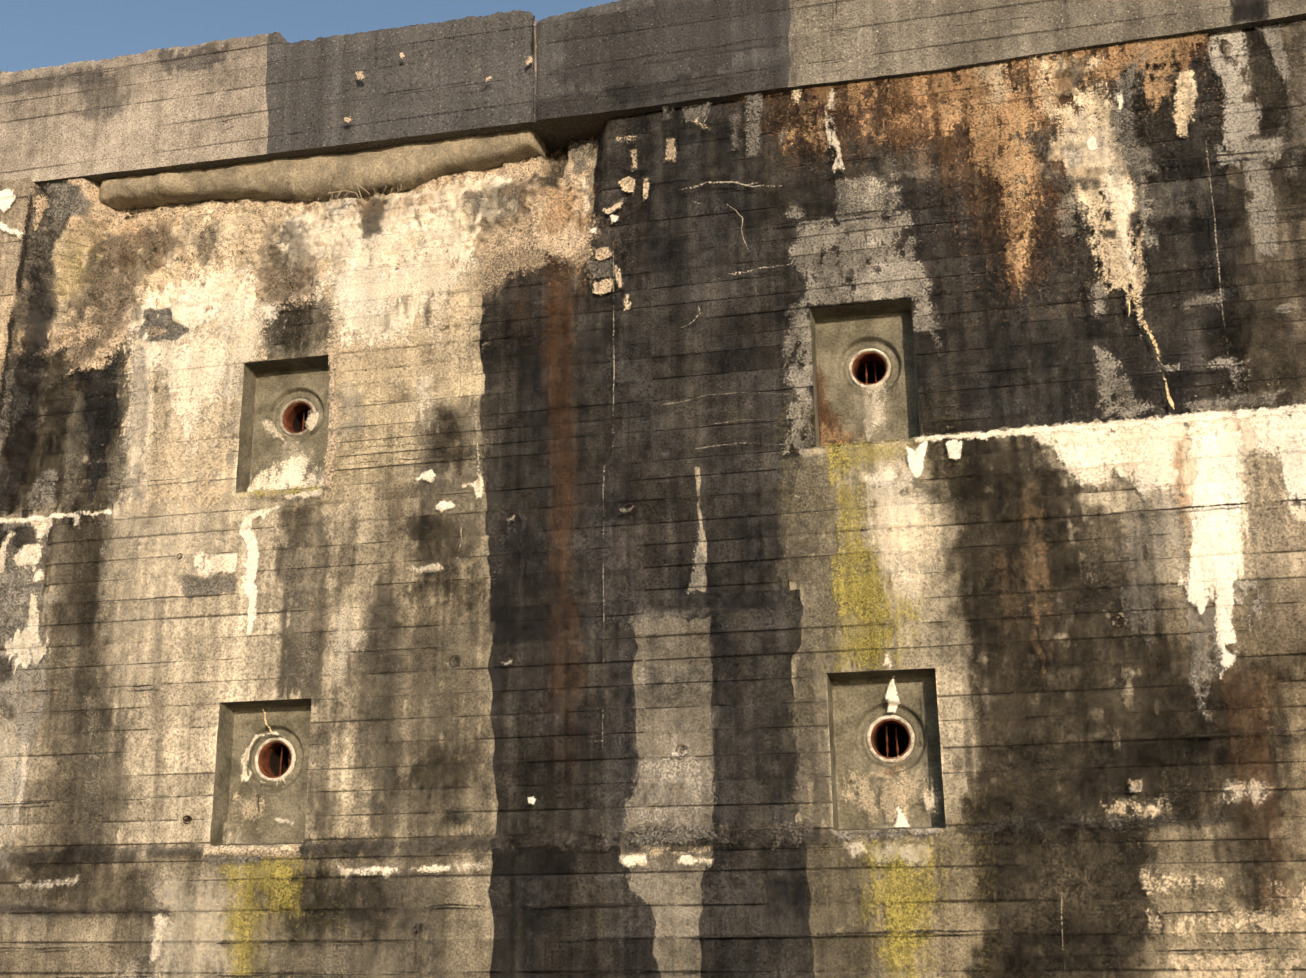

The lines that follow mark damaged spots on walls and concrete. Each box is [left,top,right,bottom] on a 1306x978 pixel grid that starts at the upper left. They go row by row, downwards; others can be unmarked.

spalling [665,139,676,160]
spalling [663,102,709,128]
spalling [730,94,763,157]
corrosion [787,57,1050,288]
corrosion [1074,33,1207,137]
leakage [0,262,473,869]
spalling [0,136,650,681]
leakage [263,0,1306,978]